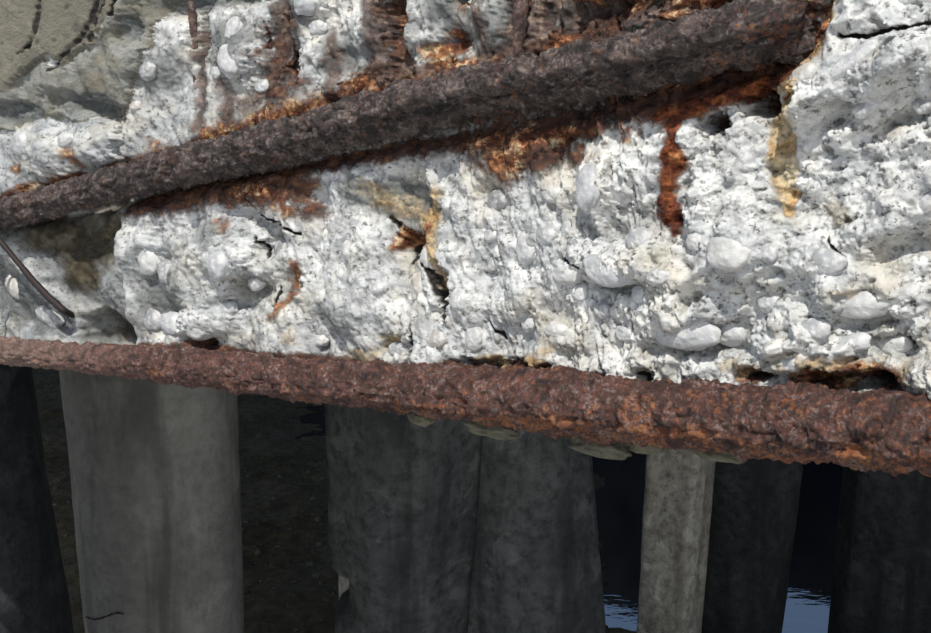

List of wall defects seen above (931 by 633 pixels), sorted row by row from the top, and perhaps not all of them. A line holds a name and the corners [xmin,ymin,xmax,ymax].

crack [838,21,931,39]
rust [122,0,836,237]
rust [0,148,85,198]
spalling [0,0,931,400]
rust [368,188,448,281]
crack [390,215,449,323]
rust [137,338,256,353]
rust [270,350,377,362]
rust [439,348,551,370]
rust [729,360,774,384]
rust [788,356,908,391]
crack [85,612,124,620]